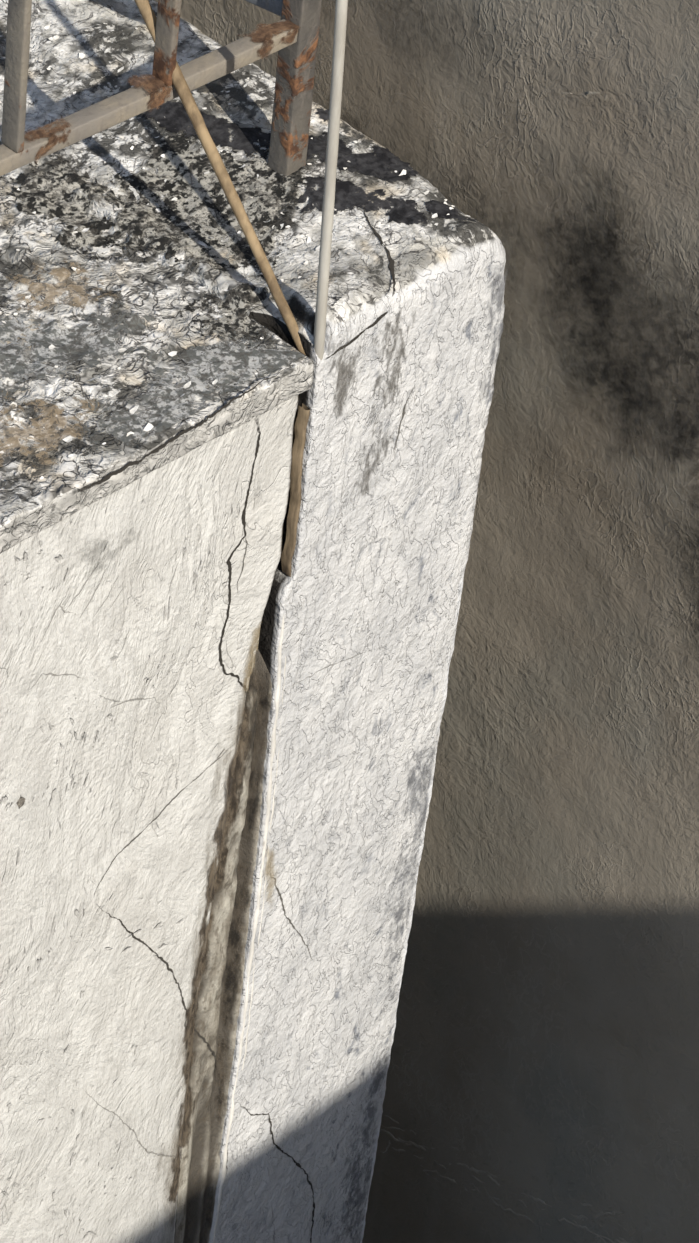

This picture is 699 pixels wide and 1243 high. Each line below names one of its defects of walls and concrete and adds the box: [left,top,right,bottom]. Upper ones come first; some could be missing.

rust [238,21,300,59]
rust [128,74,172,111]
rust [24,119,71,163]
crack [326,208,396,360]
crack [394,388,414,450]
crack [94,755,223,1071]
leakage [169,672,270,1222]
crack [270,874,312,959]
crack [244,1107,315,1243]